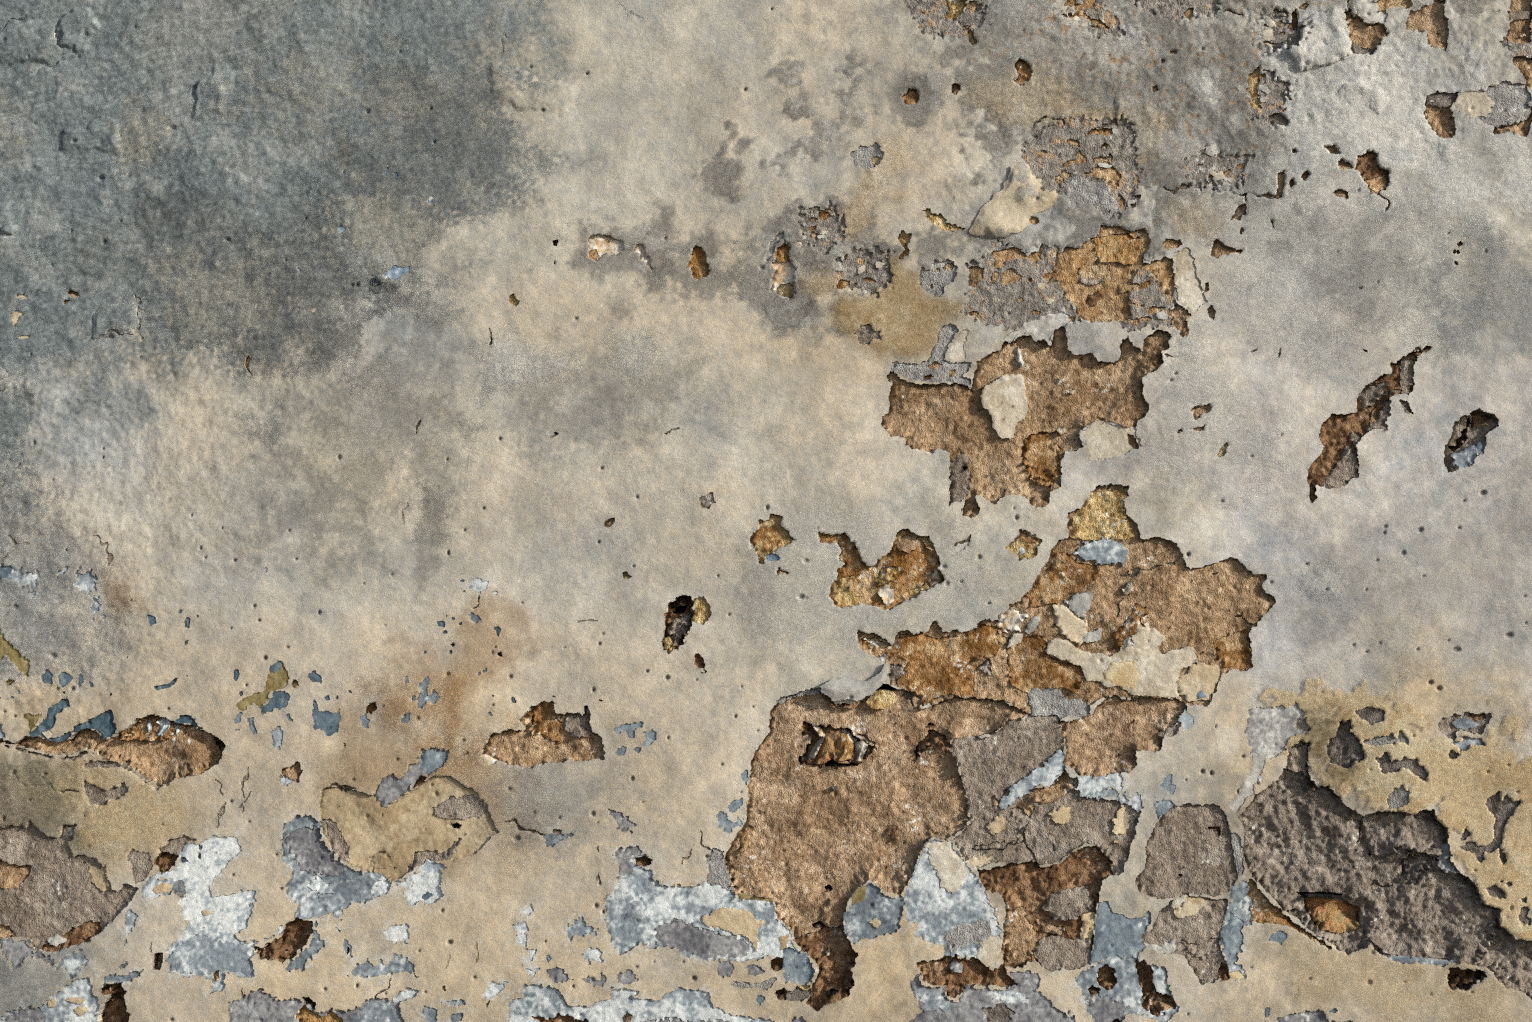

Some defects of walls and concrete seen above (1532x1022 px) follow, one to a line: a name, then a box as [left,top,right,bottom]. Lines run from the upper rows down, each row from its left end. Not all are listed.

spalling [904,0,988,45]
spalling [1063,0,1126,39]
damp [117,95,171,170]
damp [151,235,281,346]
damp [313,165,433,275]
spalling [765,200,912,299]
spalling [881,114,1255,518]
spalling [1307,346,1431,503]
spalling [1444,409,1498,473]
peeling [437,612,503,675]
spalling [0,629,352,806]
flaking render [0,747,499,1022]